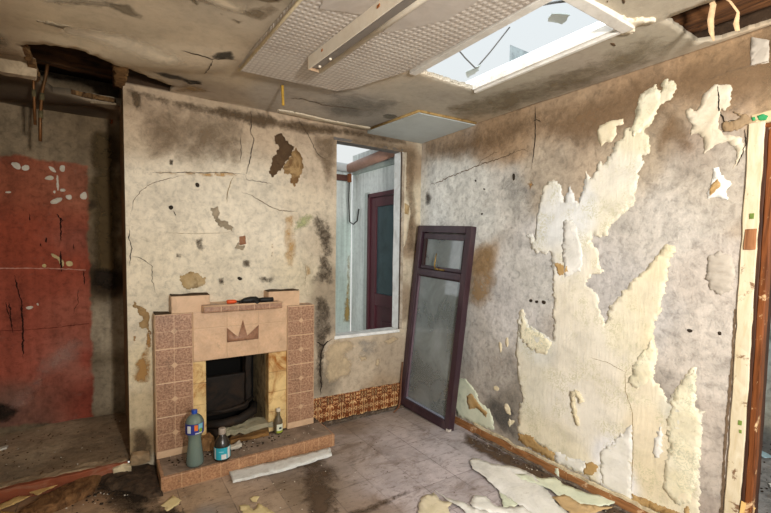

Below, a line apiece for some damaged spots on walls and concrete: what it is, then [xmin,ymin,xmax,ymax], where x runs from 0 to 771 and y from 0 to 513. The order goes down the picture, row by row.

water stain [451,49,644,113]
crack [128,112,295,290]
water stain [178,103,372,173]
flaking render [269,133,304,187]
water stain [382,137,414,249]
peeling [707,167,732,200]
crack [0,265,85,273]
water stain [315,218,332,282]
peeling [554,219,583,277]
flaking render [132,302,152,335]
water stain [317,298,331,384]
peeling [518,423,690,513]